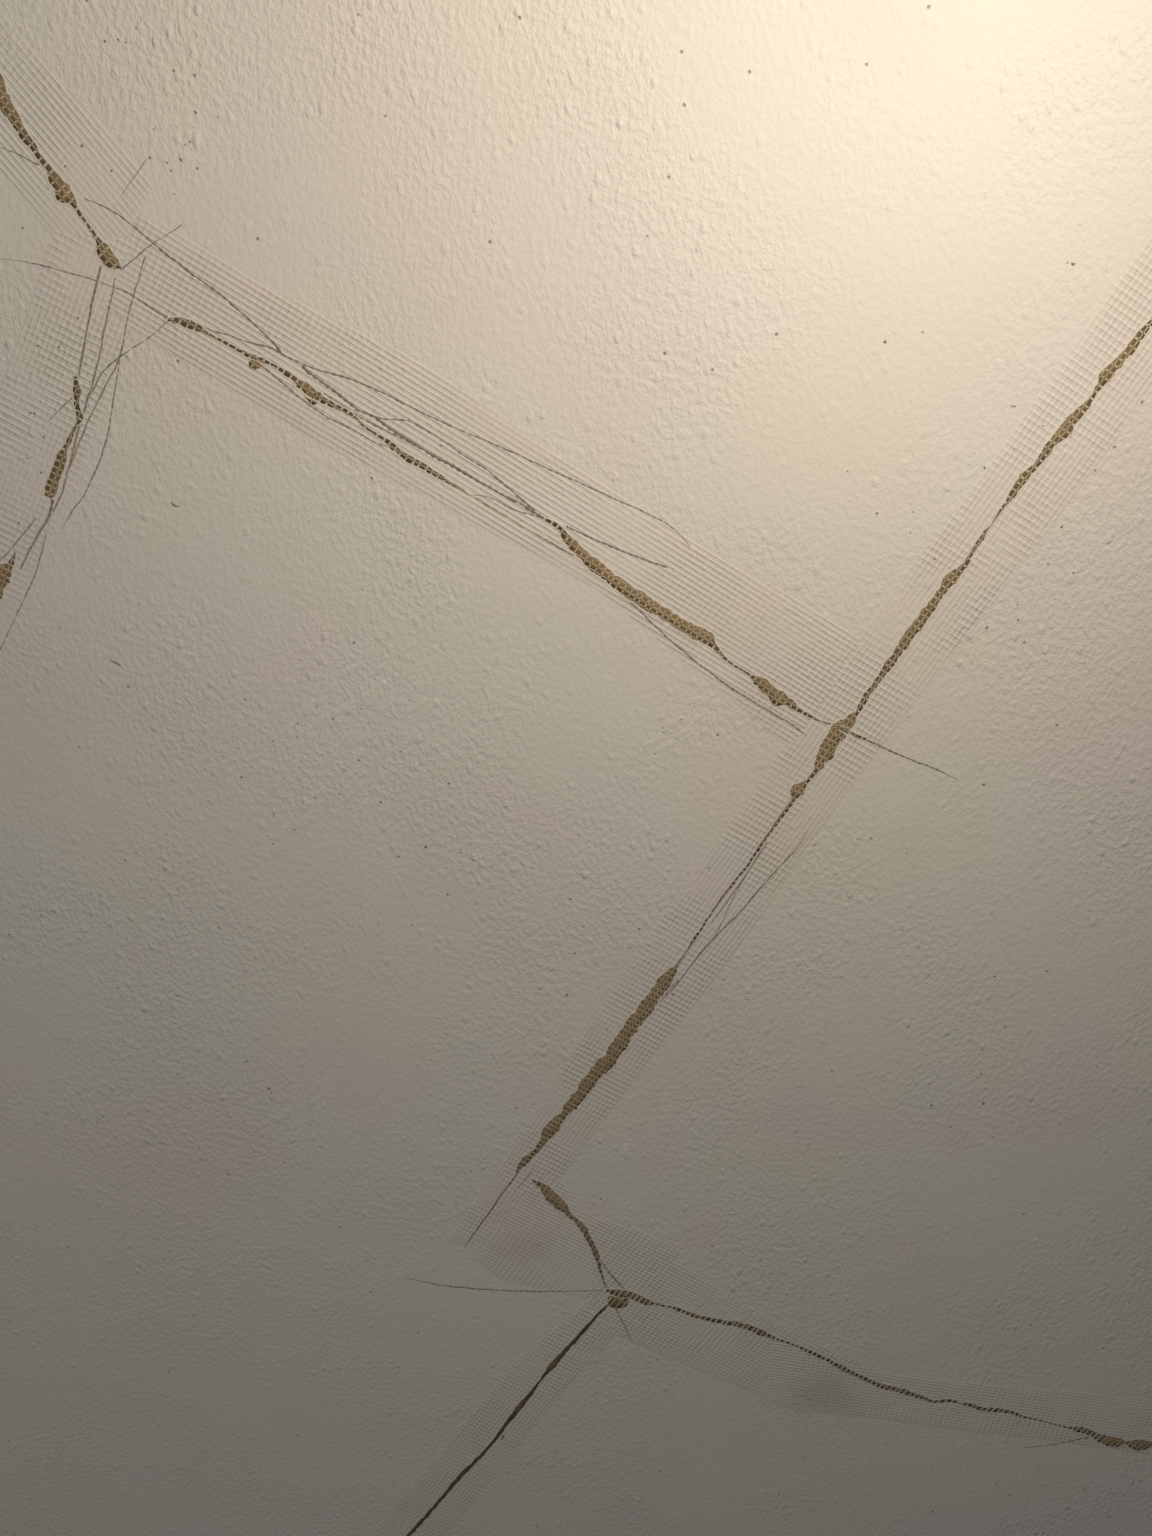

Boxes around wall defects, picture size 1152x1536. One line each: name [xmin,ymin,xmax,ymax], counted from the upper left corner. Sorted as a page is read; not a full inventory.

crack [0,70,1152,1248]
crack [404,1179,1152,1536]